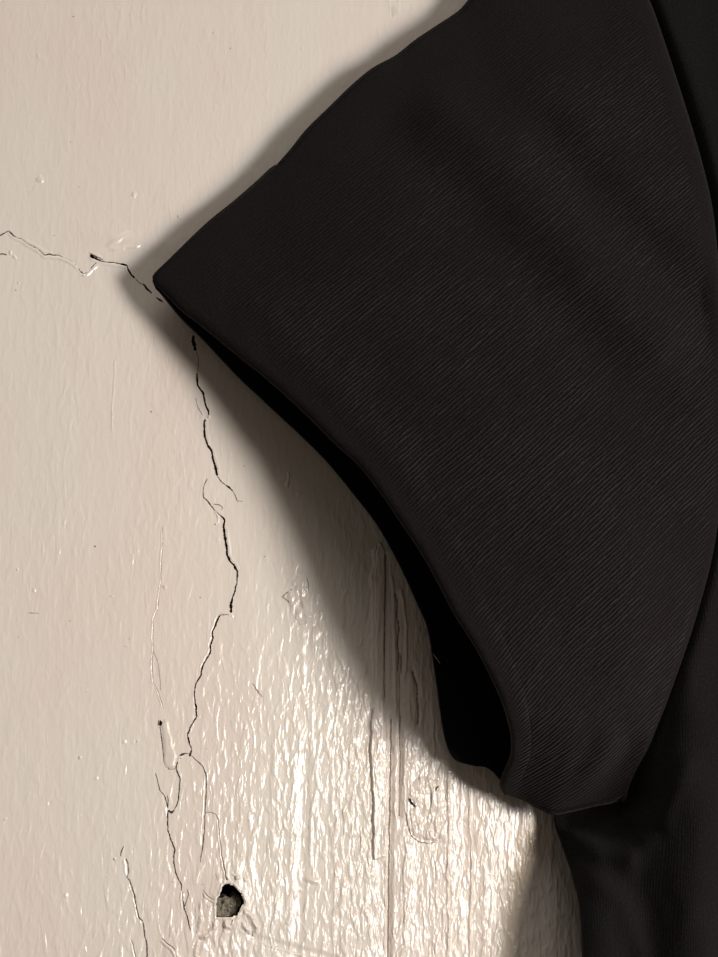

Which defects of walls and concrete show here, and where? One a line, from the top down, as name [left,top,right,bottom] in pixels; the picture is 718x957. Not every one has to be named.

crack [0,231,163,302]
crack [149,335,240,931]
crack [120,846,176,957]
spalling [206,874,248,917]